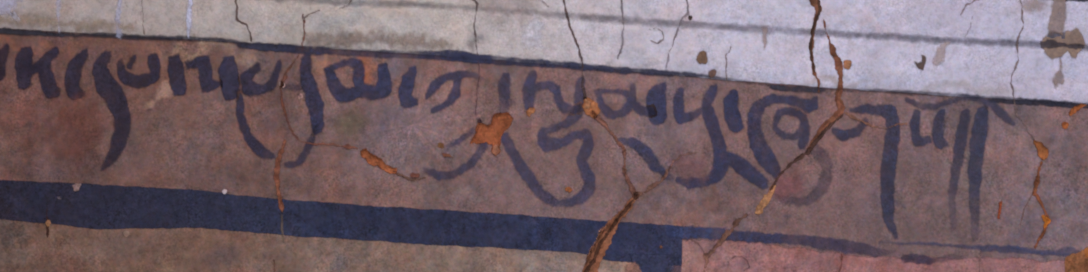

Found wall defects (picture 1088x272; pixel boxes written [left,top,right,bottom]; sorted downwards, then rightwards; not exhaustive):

crack [235,0,252,41]
spalling [470,112,513,156]
crack [563,0,695,272]
crack [693,0,907,272]
crack [1010,0,1051,249]
spalling [360,148,397,174]
spalling [1065,247,1088,272]